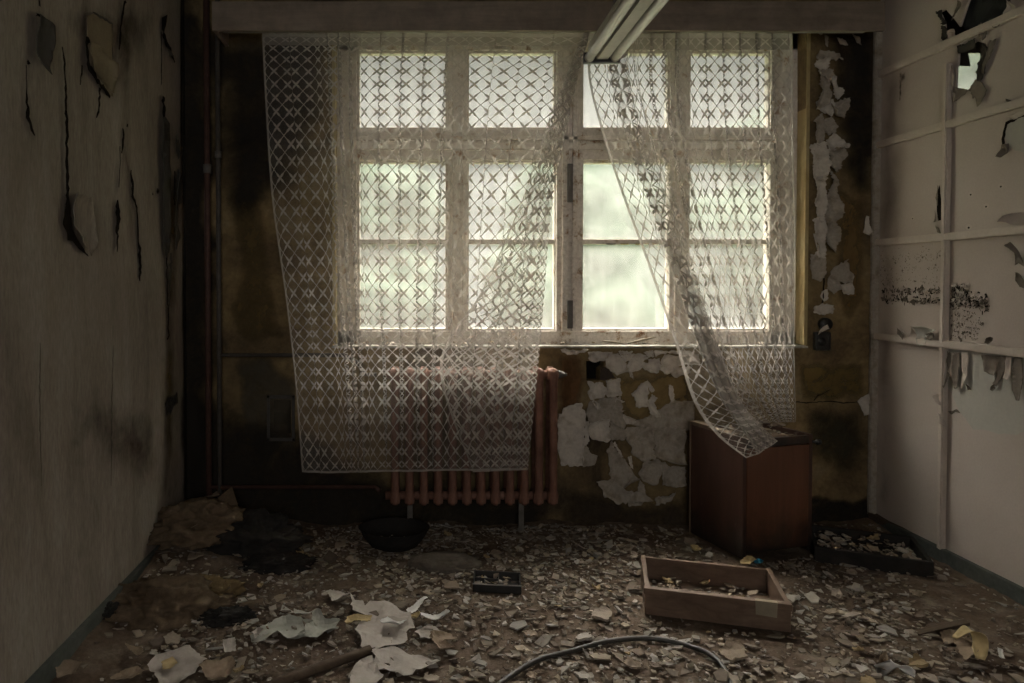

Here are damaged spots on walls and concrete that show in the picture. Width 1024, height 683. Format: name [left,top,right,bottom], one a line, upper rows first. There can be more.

hole [936,0,1016,107]
peeling [809,33,861,315]
peeling [557,348,700,507]
leakage [812,496,868,522]